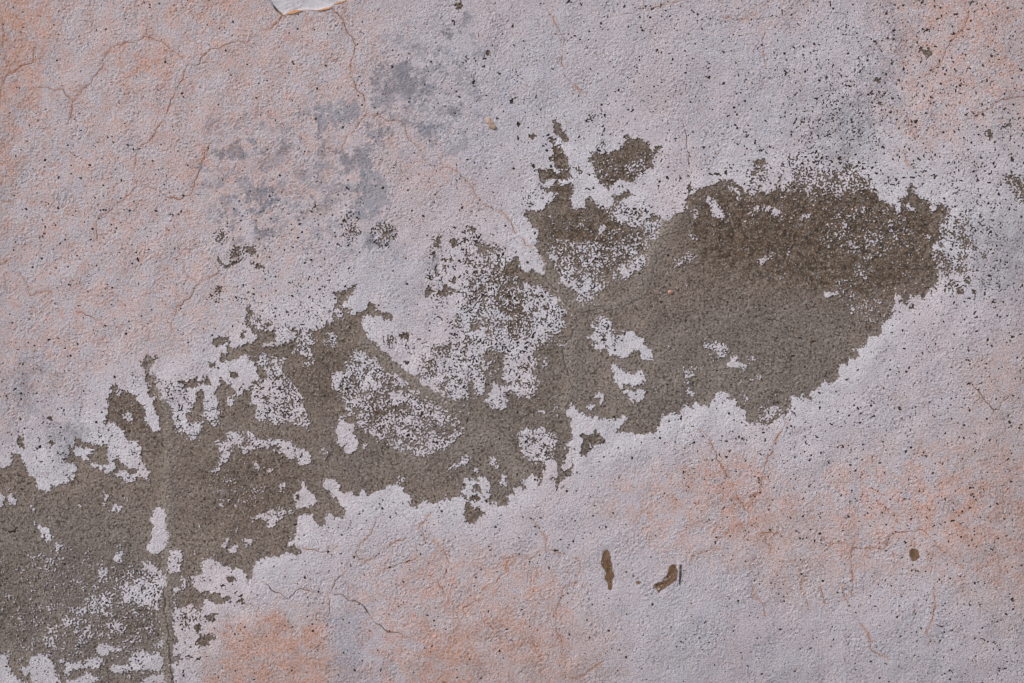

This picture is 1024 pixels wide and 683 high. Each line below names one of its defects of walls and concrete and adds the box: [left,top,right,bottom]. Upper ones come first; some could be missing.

flaking render [271,0,348,15]
peeling [314,98,393,177]
peeling [0,119,987,683]